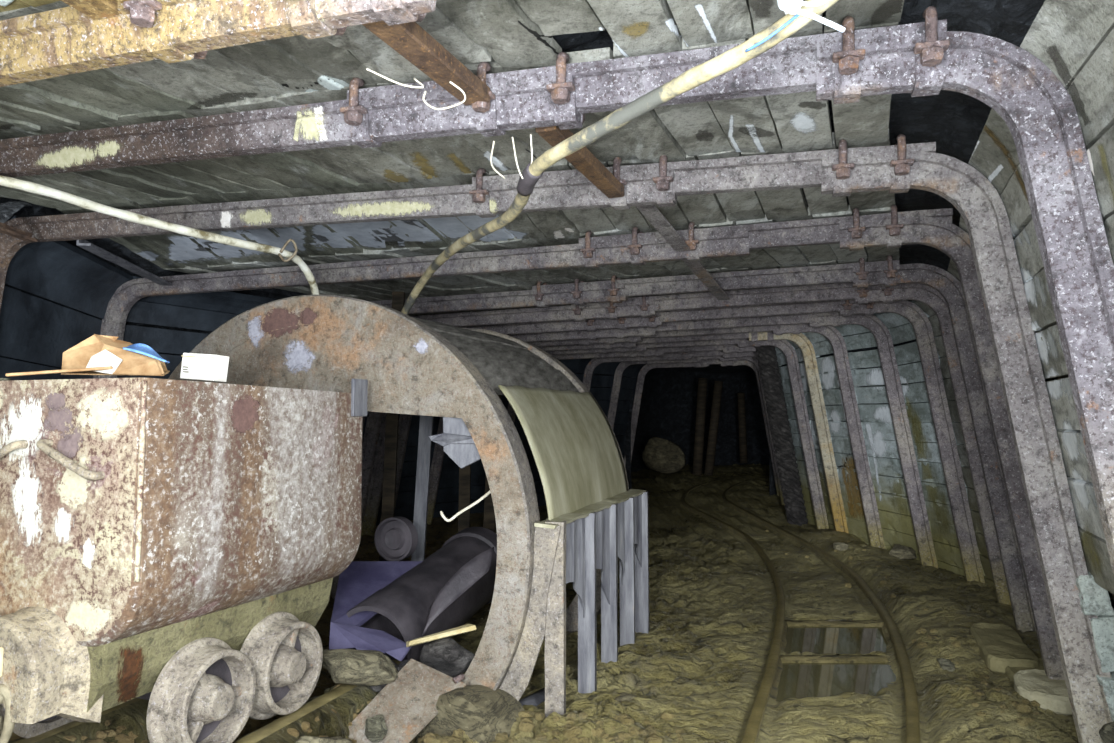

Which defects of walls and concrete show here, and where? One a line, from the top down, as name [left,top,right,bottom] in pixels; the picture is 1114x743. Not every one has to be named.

leakage [1020,268,1049,306]
leakage [1031,322,1072,399]
leakage [1061,421,1096,510]